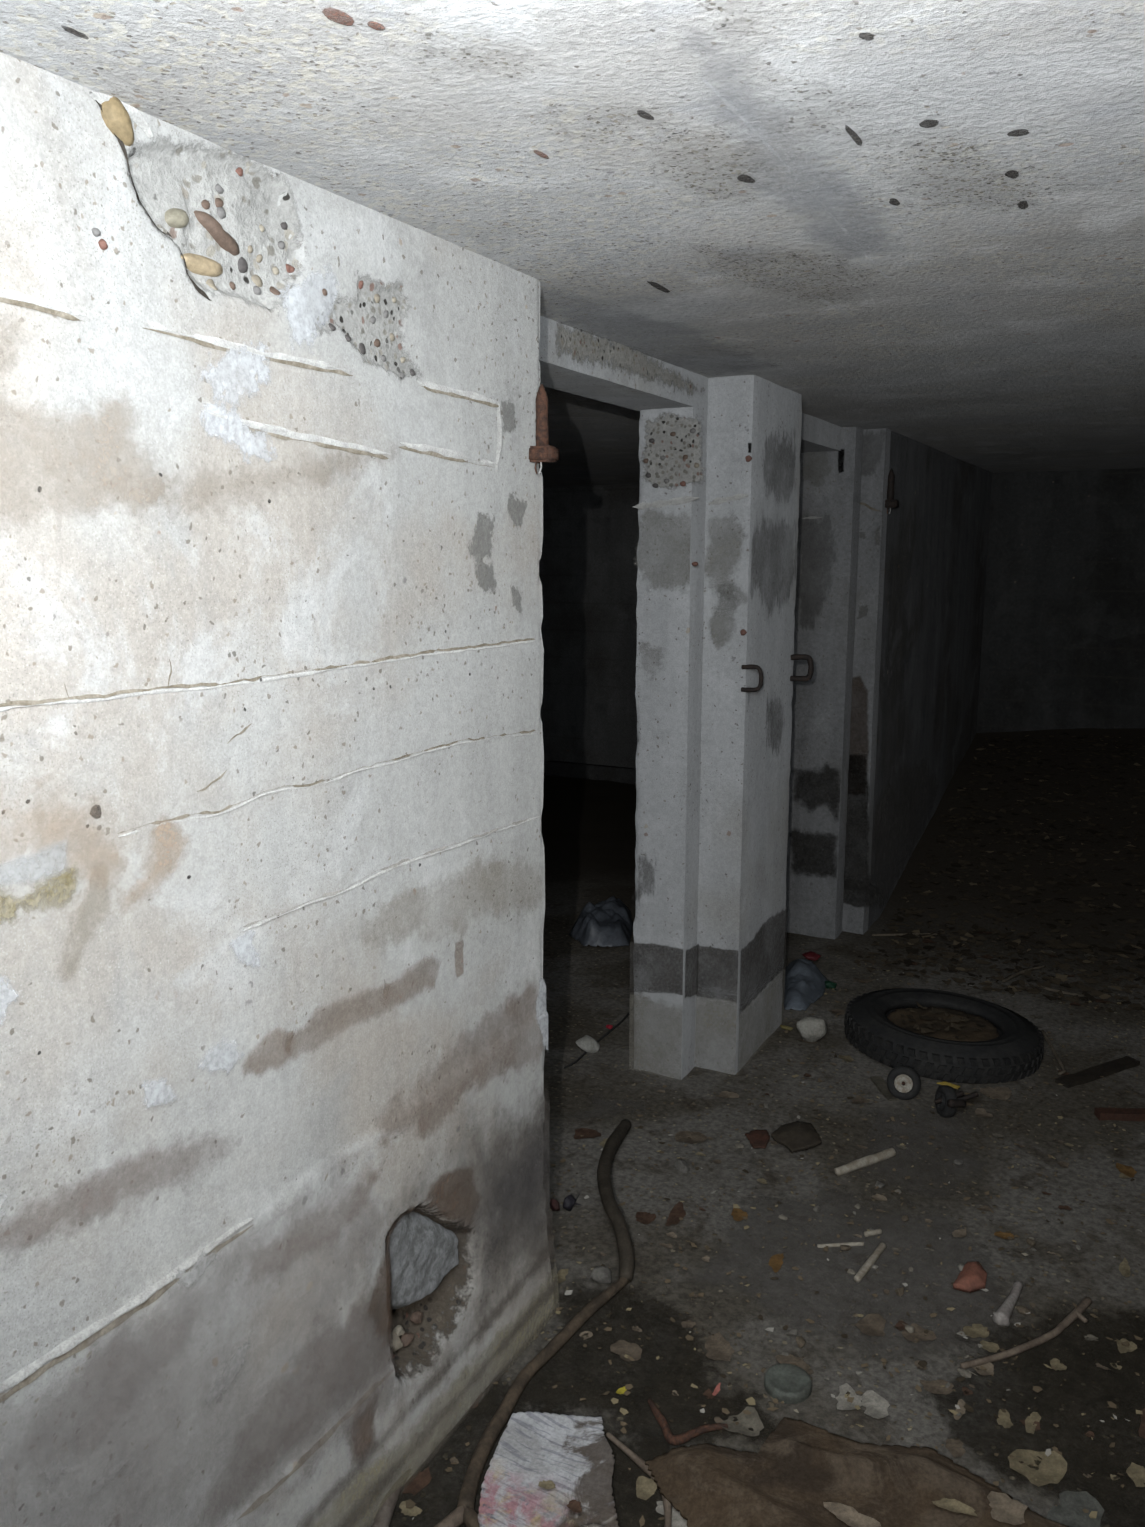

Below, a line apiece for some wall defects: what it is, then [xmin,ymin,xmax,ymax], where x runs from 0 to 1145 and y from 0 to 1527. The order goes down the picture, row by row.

spalling [89,92,306,310]
spalling [315,276,418,379]
damp [201,342,272,460]
crack [0,638,534,712]
crack [118,724,538,837]
damp [455,942,463,976]
spalling [385,1205,471,1377]